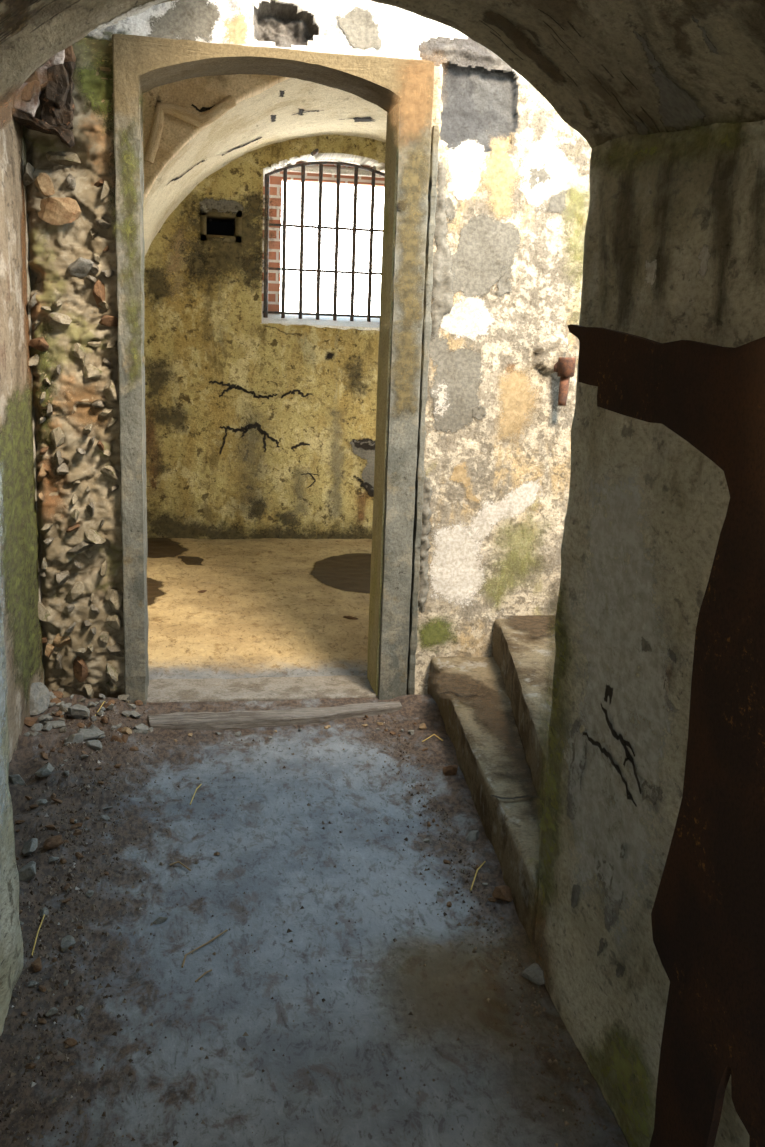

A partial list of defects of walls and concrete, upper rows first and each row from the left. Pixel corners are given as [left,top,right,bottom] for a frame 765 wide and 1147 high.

flaking render [0,0,80,45]
water stain [92,0,167,34]
spalling [148,0,382,53]
flaking render [419,9,668,433]
spalling [23,38,125,699]
crack [209,381,319,488]
crack [582,703,641,807]